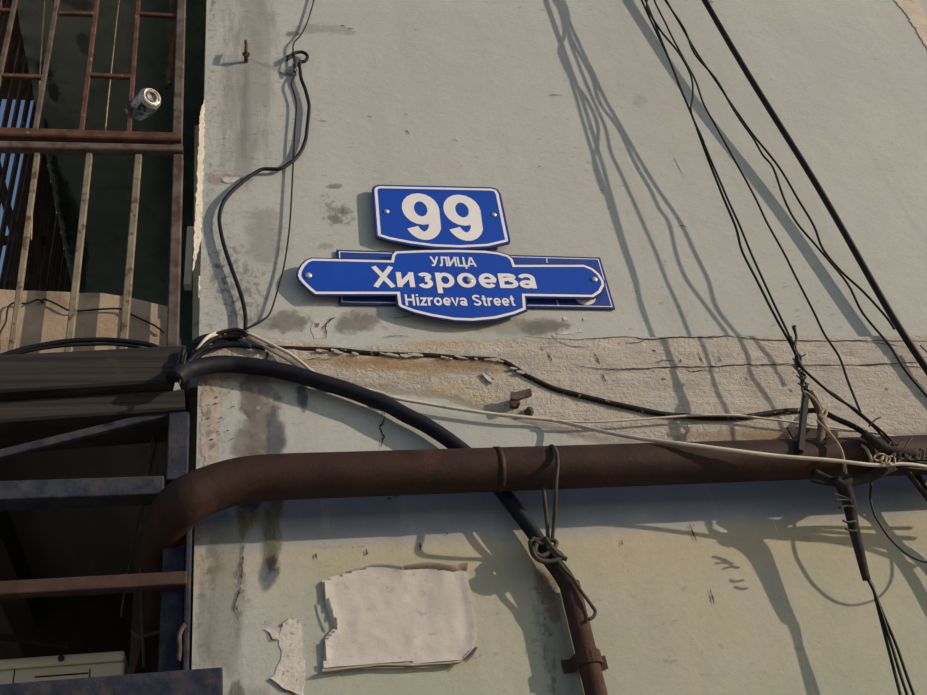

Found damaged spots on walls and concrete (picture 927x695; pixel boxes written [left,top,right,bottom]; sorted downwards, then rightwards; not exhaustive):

crack [527,335,921,372]
damp [207,374,286,456]
damp [238,500,282,588]
peeling [264,616,306,695]